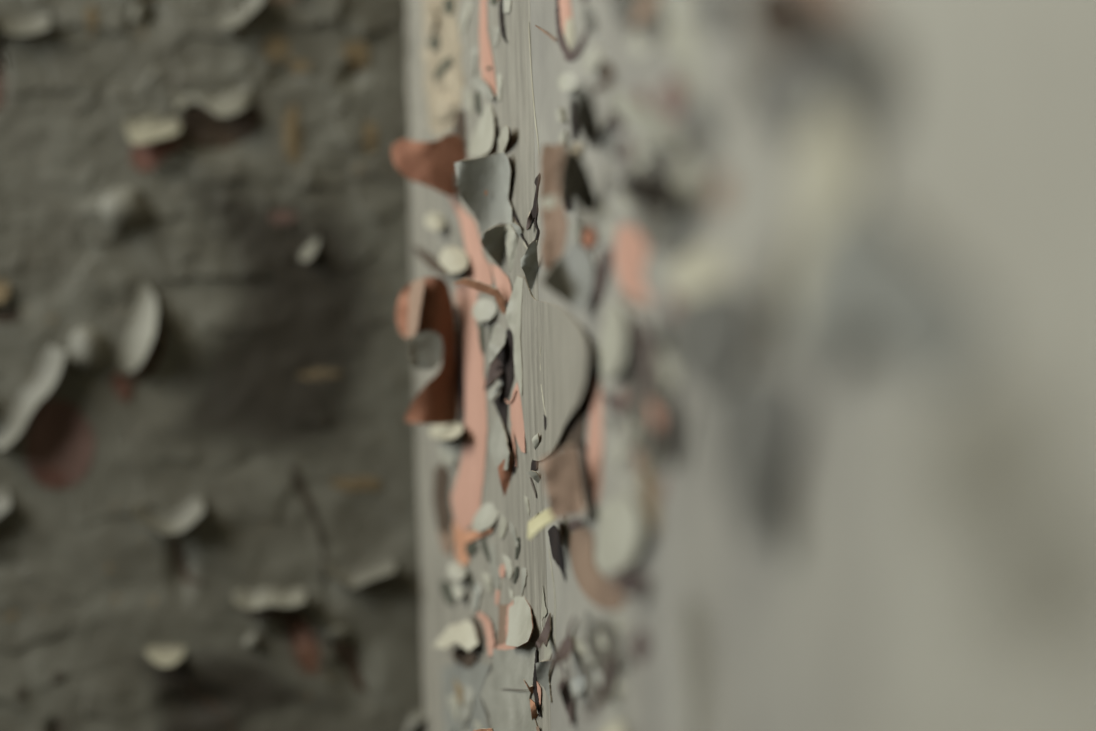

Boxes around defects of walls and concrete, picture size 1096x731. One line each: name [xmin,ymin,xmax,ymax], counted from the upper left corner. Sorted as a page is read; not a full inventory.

peeling [0,6,50,36]
peeling [216,0,264,29]
peeling [612,0,897,142]
peeling [124,88,263,173]
peeling [618,163,674,214]
peeling [0,345,95,489]
peeling [111,283,167,404]
peeling [391,0,659,731]
peeling [669,246,803,545]
peeling [130,497,206,585]
peeling [233,587,307,645]
peeling [145,645,235,731]